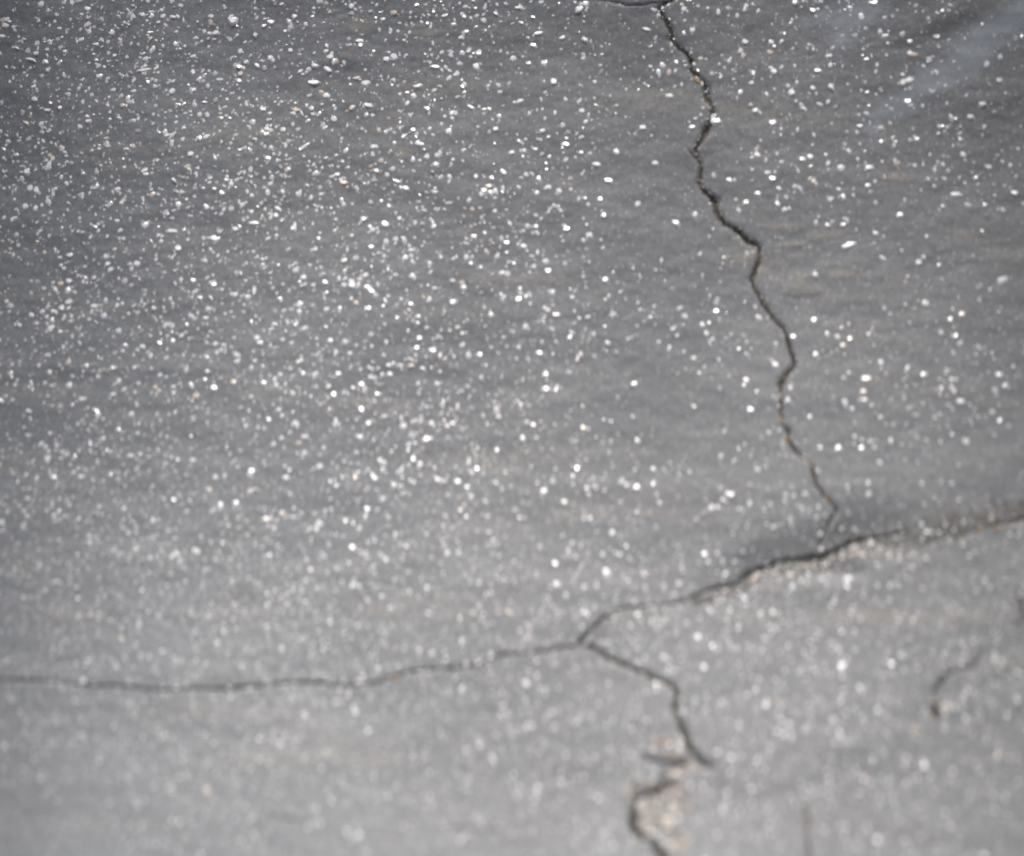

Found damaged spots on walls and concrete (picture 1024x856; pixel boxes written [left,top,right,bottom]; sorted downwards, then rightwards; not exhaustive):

crack [588,0,839,551]
crack [0,501,1024,769]